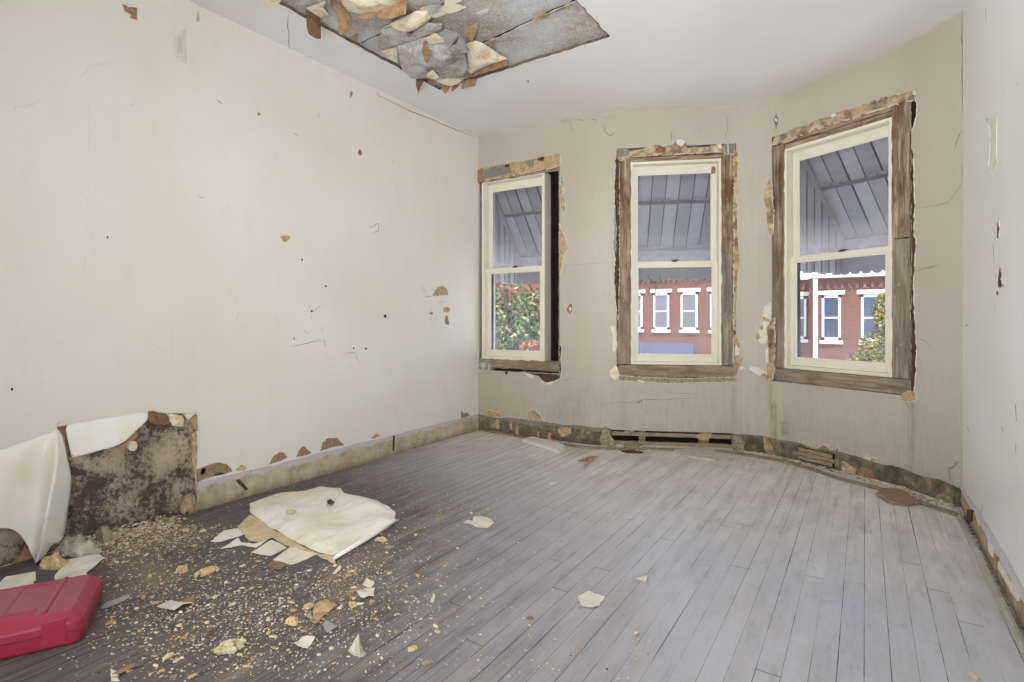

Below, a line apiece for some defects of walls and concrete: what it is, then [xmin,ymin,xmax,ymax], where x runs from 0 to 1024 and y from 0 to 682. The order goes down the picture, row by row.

peeling [121,3,138,21]
spalling [279,1,306,18]
spalling [320,22,402,70]
spalling [424,0,610,90]
spalling [771,90,918,145]
crack [918,12,963,209]
spalling [610,139,776,384]
spalling [996,266,1004,296]
peeling [296,437,344,457]
damp [47,409,198,553]
peeling [195,462,247,483]
damp [0,528,33,567]